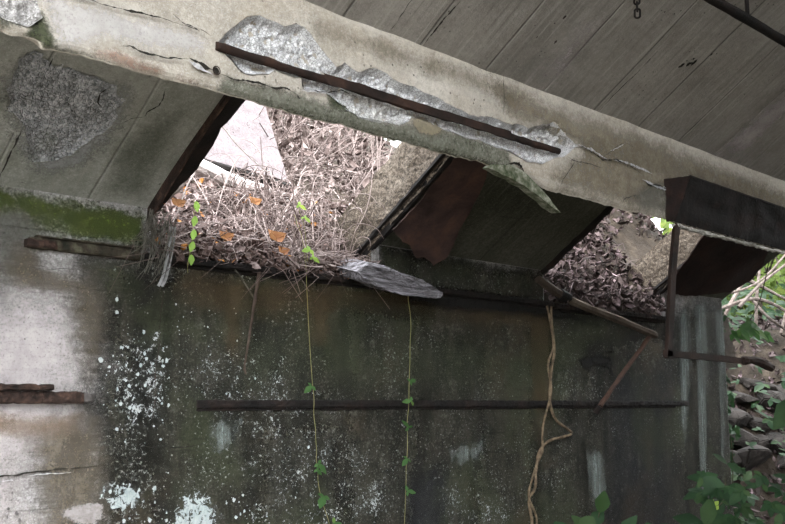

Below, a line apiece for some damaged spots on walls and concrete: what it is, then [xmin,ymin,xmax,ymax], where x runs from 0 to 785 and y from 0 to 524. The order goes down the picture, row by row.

spalling [0,0,43,27]
spalling [5,51,125,162]
crack [92,0,208,34]
crack [126,45,353,99]
spalling [219,15,578,213]
crack [562,143,666,202]
water stain [0,191,142,285]
water stain [0,279,102,392]
crack [0,463,103,482]
water stain [0,403,222,524]
water stain [250,245,610,524]
water stain [579,304,707,524]